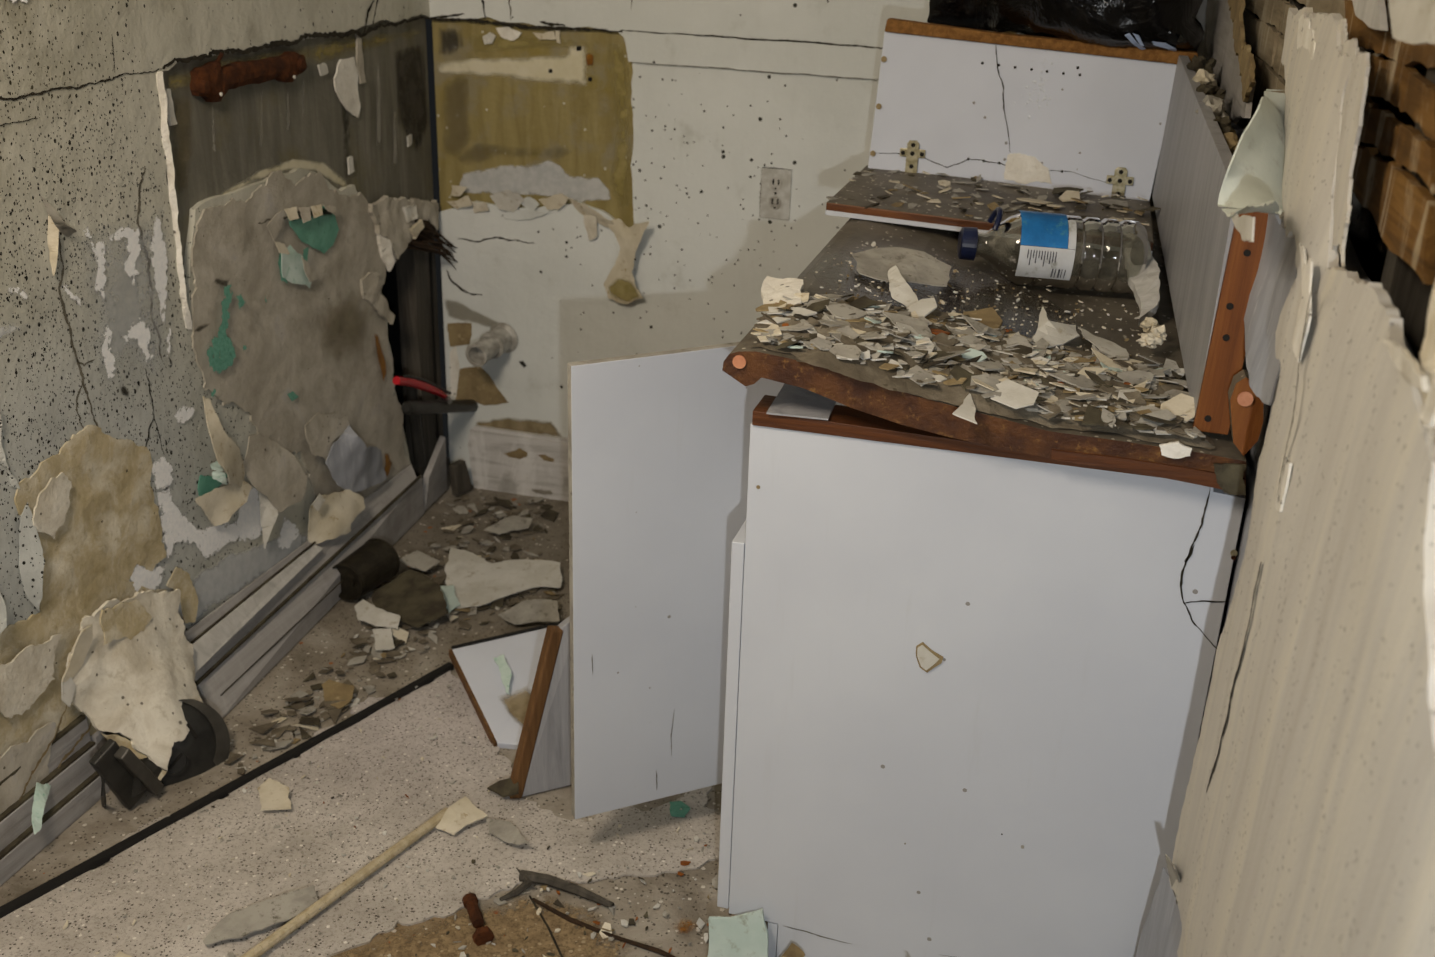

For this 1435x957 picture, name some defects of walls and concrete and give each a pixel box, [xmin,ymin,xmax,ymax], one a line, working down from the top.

crack [0,0,632,126]
peeling [496,27,561,44]
peeling [1388,0,1435,44]
peeling [40,195,77,276]
flaking render [156,71,649,549]
flaking render [0,414,203,835]
peeling [372,628,395,651]